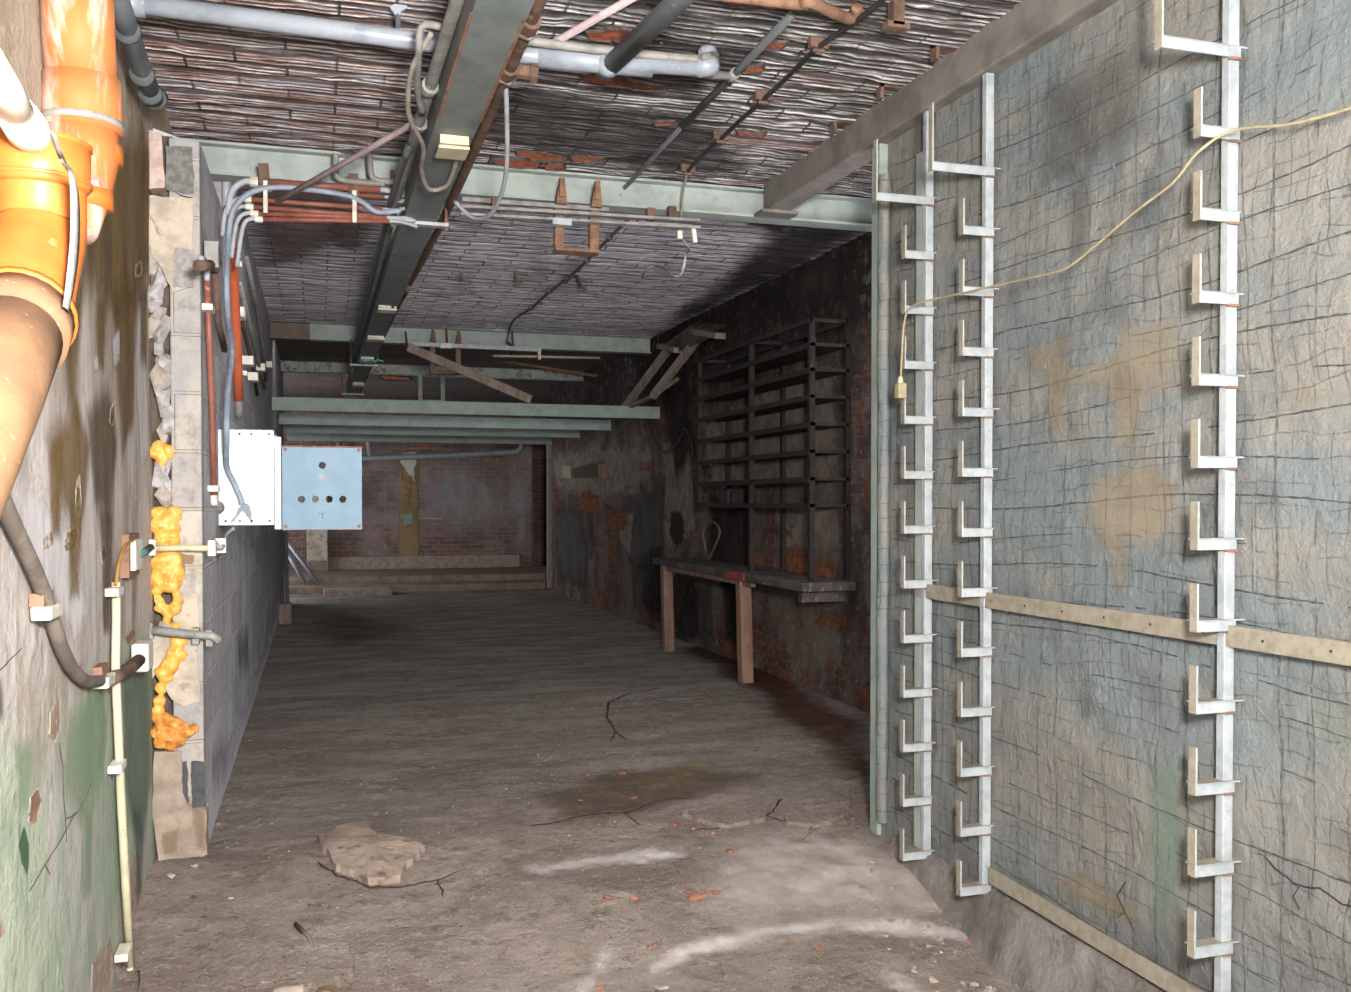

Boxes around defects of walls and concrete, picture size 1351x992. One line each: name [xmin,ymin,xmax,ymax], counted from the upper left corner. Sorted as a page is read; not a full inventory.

water stain [16,140,152,639]
water stain [720,839,930,905]
crack [1264,856,1351,910]
peeling [90,936,117,992]
water stain [652,919,967,968]